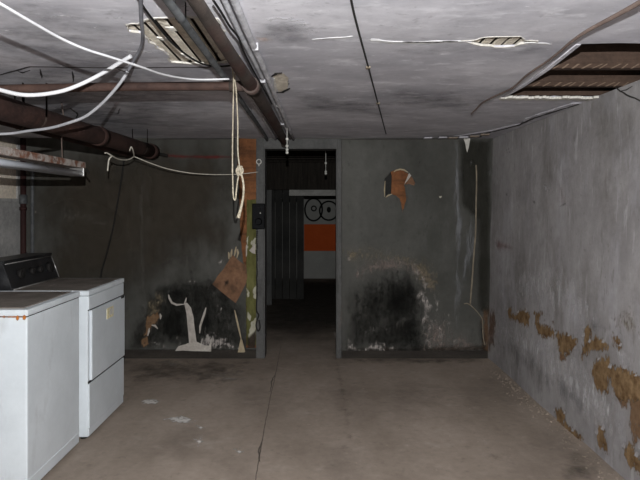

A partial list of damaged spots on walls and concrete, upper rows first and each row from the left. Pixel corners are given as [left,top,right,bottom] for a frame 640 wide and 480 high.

flaking render [101,6,228,65]
crack [312,34,353,42]
crack [370,37,465,45]
peeling [213,199,256,352]
damp [136,281,233,348]
crack [255,348,281,480]
peeling [507,307,640,476]